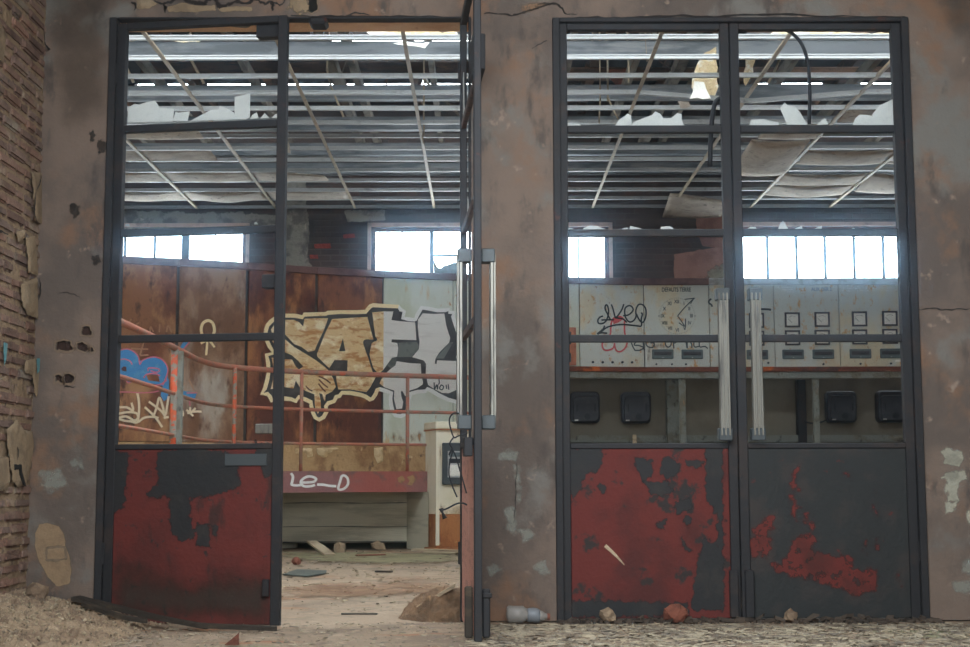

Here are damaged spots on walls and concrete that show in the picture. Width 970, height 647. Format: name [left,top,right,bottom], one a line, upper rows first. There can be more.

crack [131,0,441,17]
crack [484,2,600,17]
crack [635,11,905,19]